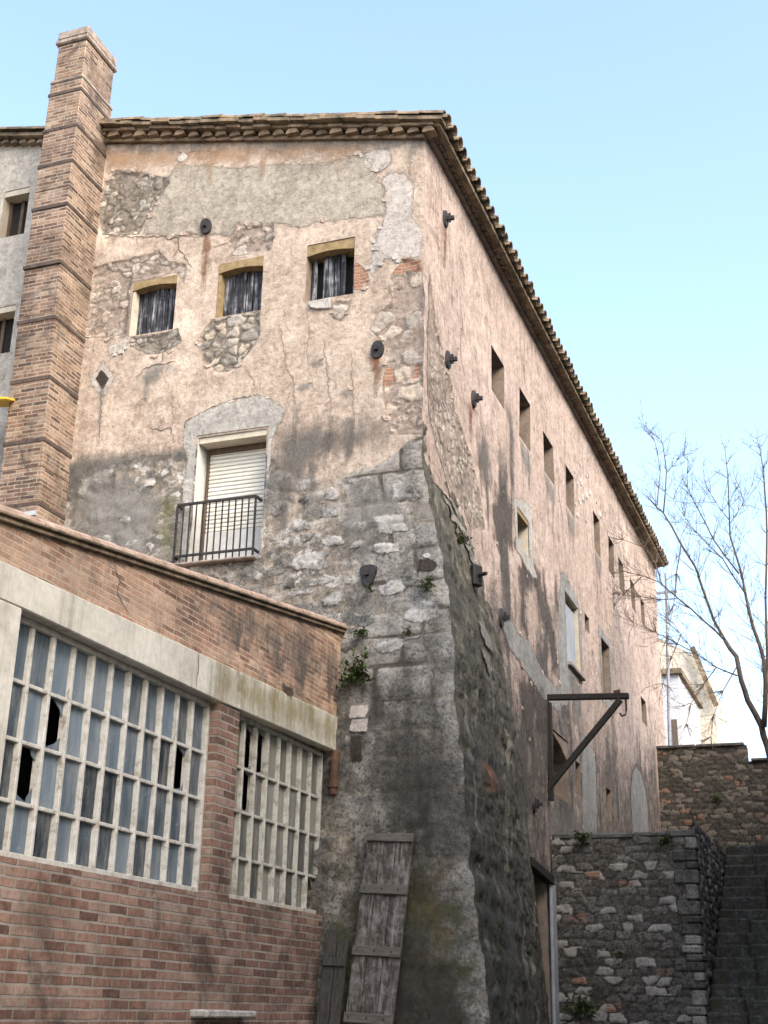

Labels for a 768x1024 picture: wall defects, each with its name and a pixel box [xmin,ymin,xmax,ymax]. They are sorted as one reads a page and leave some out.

peeling [86,148,561,685]
damp [479,442,490,521]
damp [507,410,530,487]